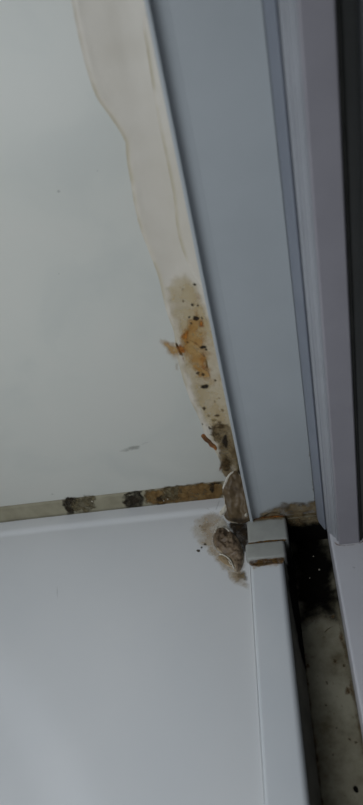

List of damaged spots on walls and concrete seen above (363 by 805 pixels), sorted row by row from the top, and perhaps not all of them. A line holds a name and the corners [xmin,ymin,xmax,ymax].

water stain [123,283,241,508]
corrosion [178,320,210,378]
water stain [62,496,95,514]
water stain [287,523,339,667]